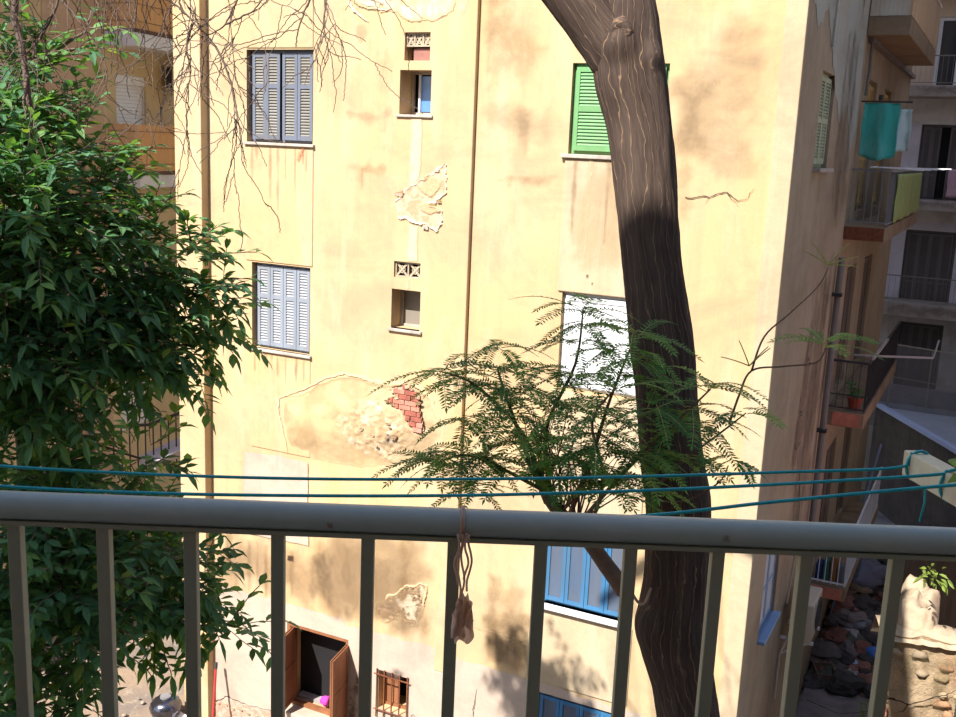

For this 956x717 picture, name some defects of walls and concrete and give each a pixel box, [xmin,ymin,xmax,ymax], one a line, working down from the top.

flaking render [348,0,456,22]
flaking render [394,164,448,232]
crack [685,188,754,204]
flaking render [389,385,424,433]
flaking render [374,582,428,627]
crack [887,690,956,714]